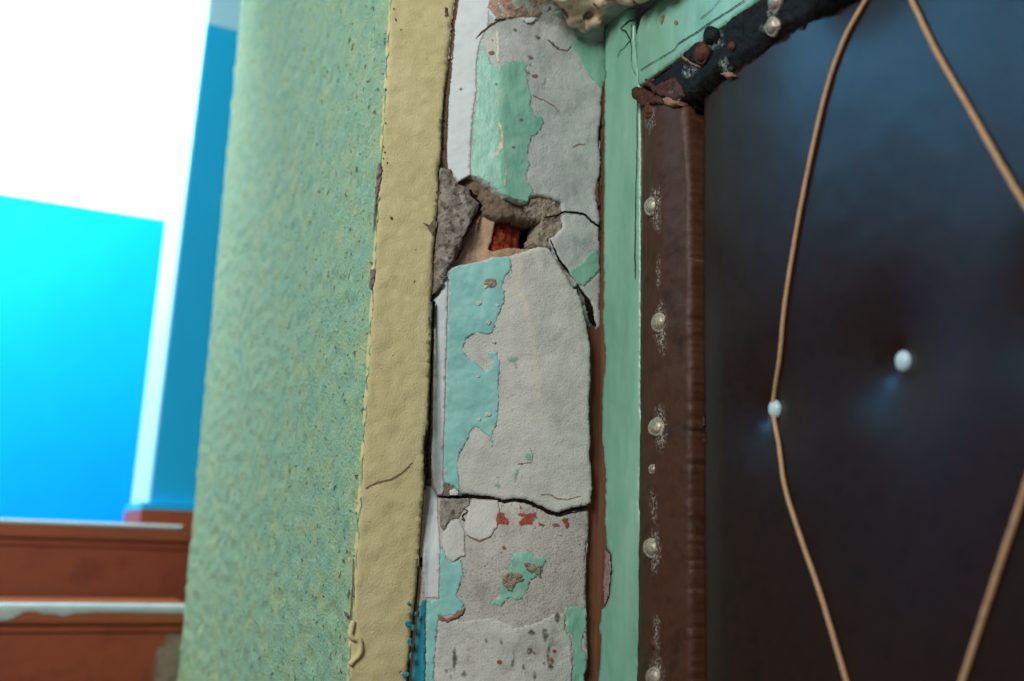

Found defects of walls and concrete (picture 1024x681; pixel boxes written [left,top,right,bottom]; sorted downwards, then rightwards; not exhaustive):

crack [440,0,506,172]
peeling [535,36,605,90]
peeling [422,0,587,681]
crack [544,114,603,326]
peeling [570,249,600,286]
crack [366,301,588,681]